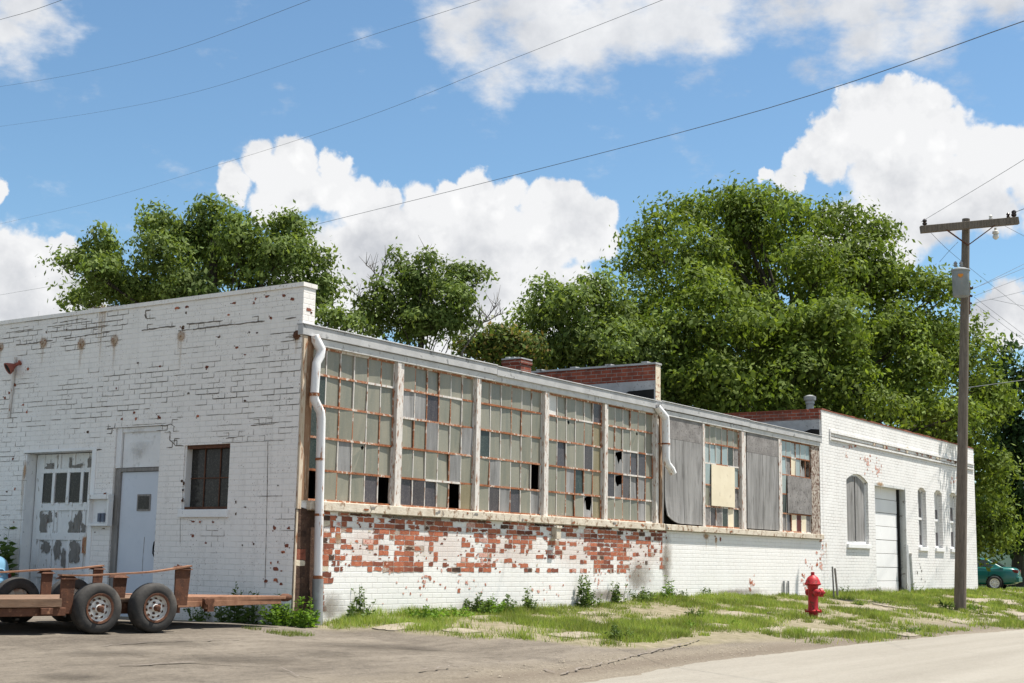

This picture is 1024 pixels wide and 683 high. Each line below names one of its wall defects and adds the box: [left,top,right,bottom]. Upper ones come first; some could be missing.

peeling [843,442,957,476]
peeling [39,510,105,568]
peeling [263,507,668,615]